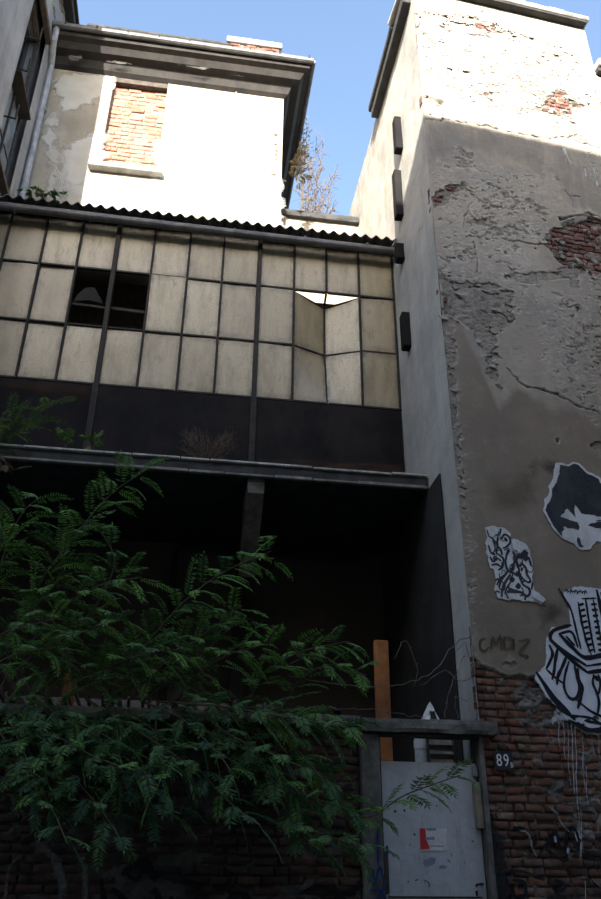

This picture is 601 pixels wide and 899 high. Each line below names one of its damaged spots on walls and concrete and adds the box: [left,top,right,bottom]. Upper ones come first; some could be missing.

peeling [41,72,193,216]
peeling [249,177,284,227]
peeling [416,12,601,164]
crack [432,119,601,149]
spalling [427,147,601,520]
crack [507,369,594,411]